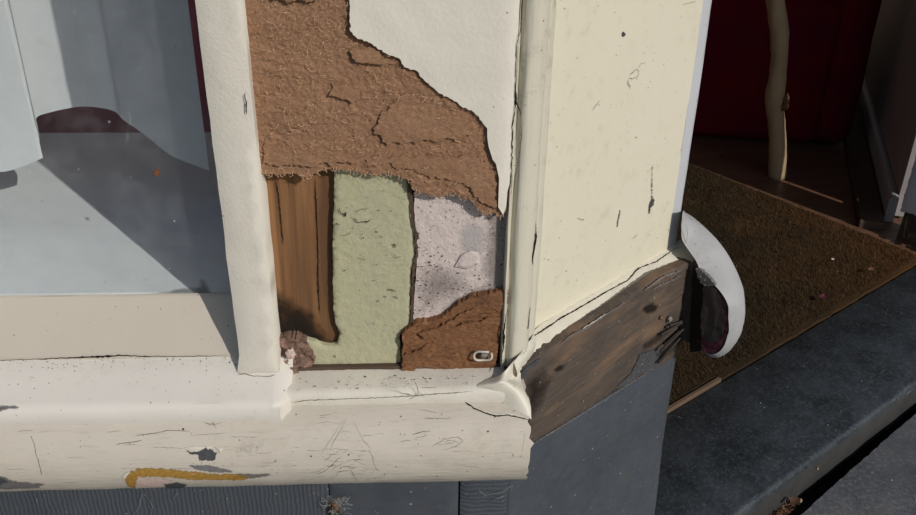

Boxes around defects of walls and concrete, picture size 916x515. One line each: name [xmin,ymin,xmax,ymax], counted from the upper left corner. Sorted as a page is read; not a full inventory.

crack [501,231,729,370]
peeling [402,316,501,371]
crack [112,381,529,485]
peeling [0,476,42,489]
peeling [122,445,269,489]